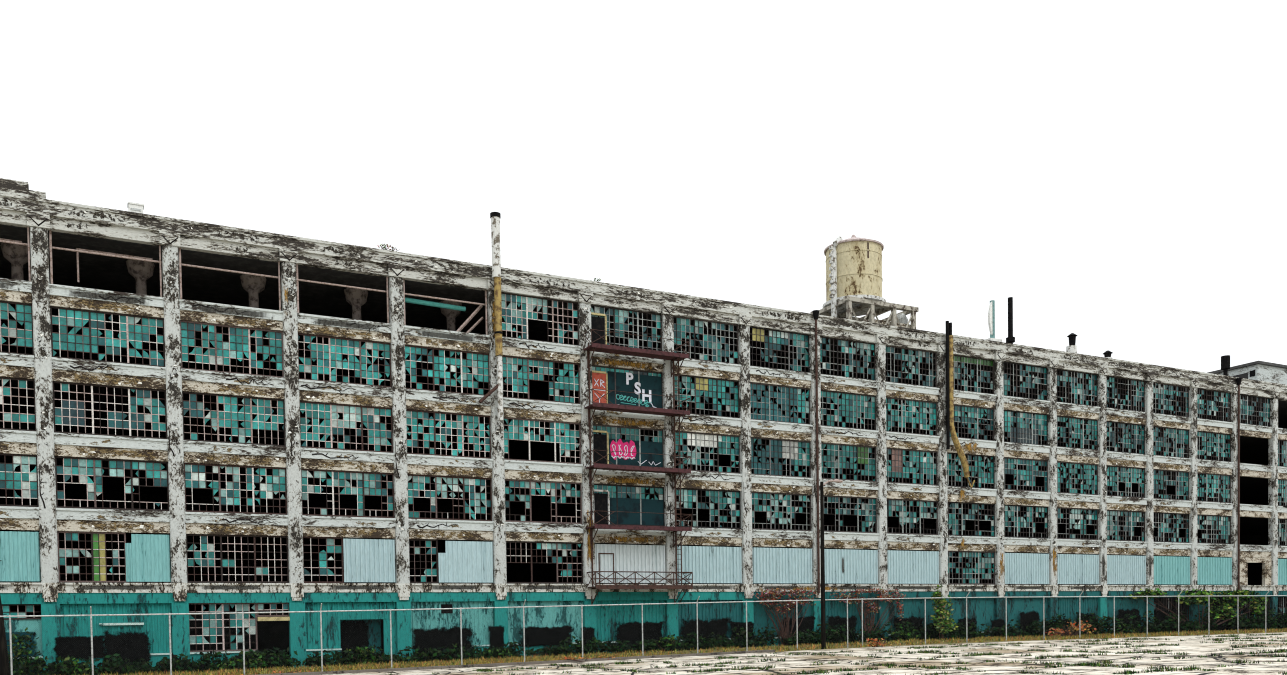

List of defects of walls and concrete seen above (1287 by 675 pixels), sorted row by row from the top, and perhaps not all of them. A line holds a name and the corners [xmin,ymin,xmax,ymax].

peeling [57,207,130,232]
peeling [191,227,259,253]
peeling [316,246,360,269]
peeling [762,310,803,327]
peeling [393,296,480,380]
peeling [413,398,481,412]
spalling [40,403,49,447]
peeling [66,439,158,459]
peeling [197,415,298,465]
peeling [963,401,1138,510]